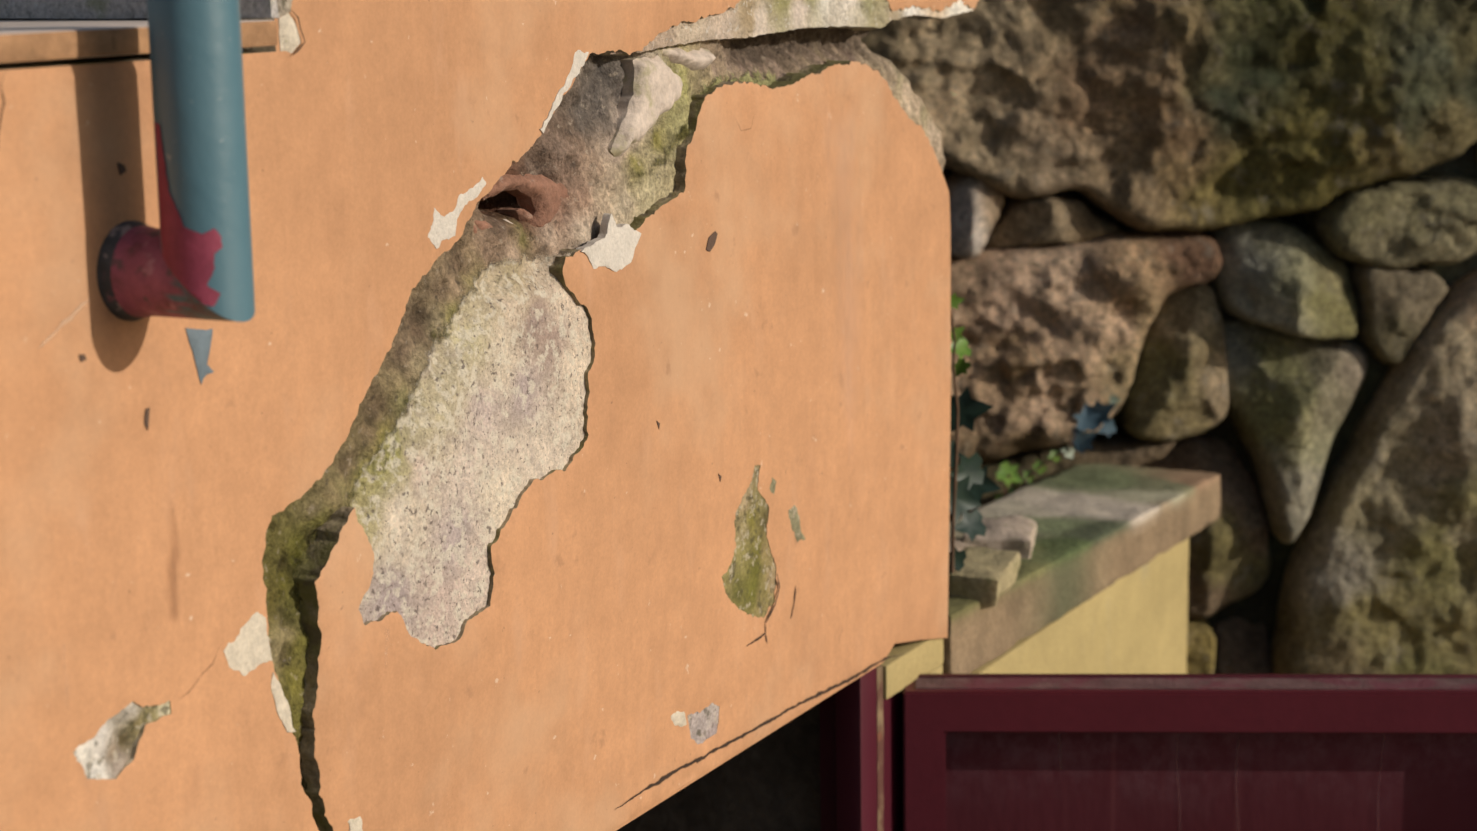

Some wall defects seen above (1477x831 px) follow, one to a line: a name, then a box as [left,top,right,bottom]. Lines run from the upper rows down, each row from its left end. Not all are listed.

flaking render [276,0,301,53]
crack [223,0,974,809]
peeling [788,505,805,543]
peeling [722,465,796,646]
flaking render [73,701,170,779]
flaking render [671,703,719,744]
crack [348,816,363,831]